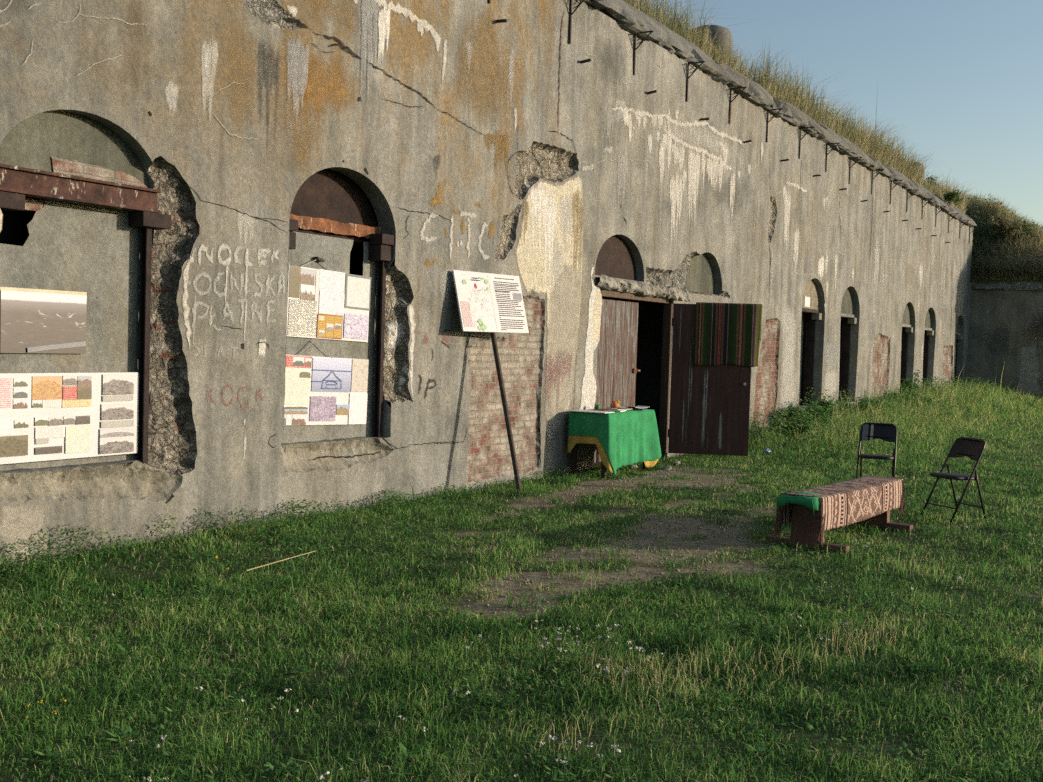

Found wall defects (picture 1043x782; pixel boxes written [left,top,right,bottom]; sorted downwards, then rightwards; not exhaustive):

spalling [241,0,300,30]
crack [284,17,484,135]
water stain [354,0,447,85]
spalling [494,141,579,261]
water stain [612,101,763,232]
flaking render [466,267,581,483]
peeling [592,291,601,345]
crack [310,429,467,460]